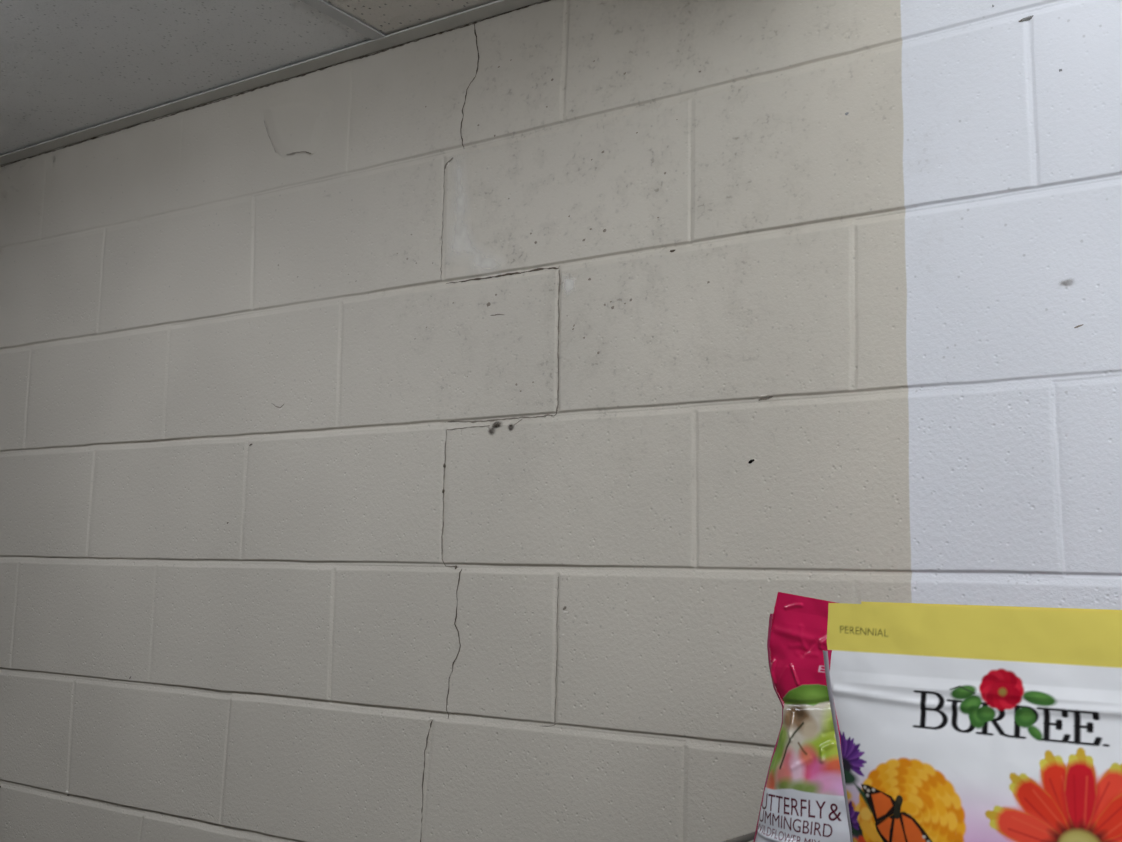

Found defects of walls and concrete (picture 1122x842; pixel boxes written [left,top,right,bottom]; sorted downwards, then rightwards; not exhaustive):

crack [1,0,551,167]
crack [420,267,561,842]